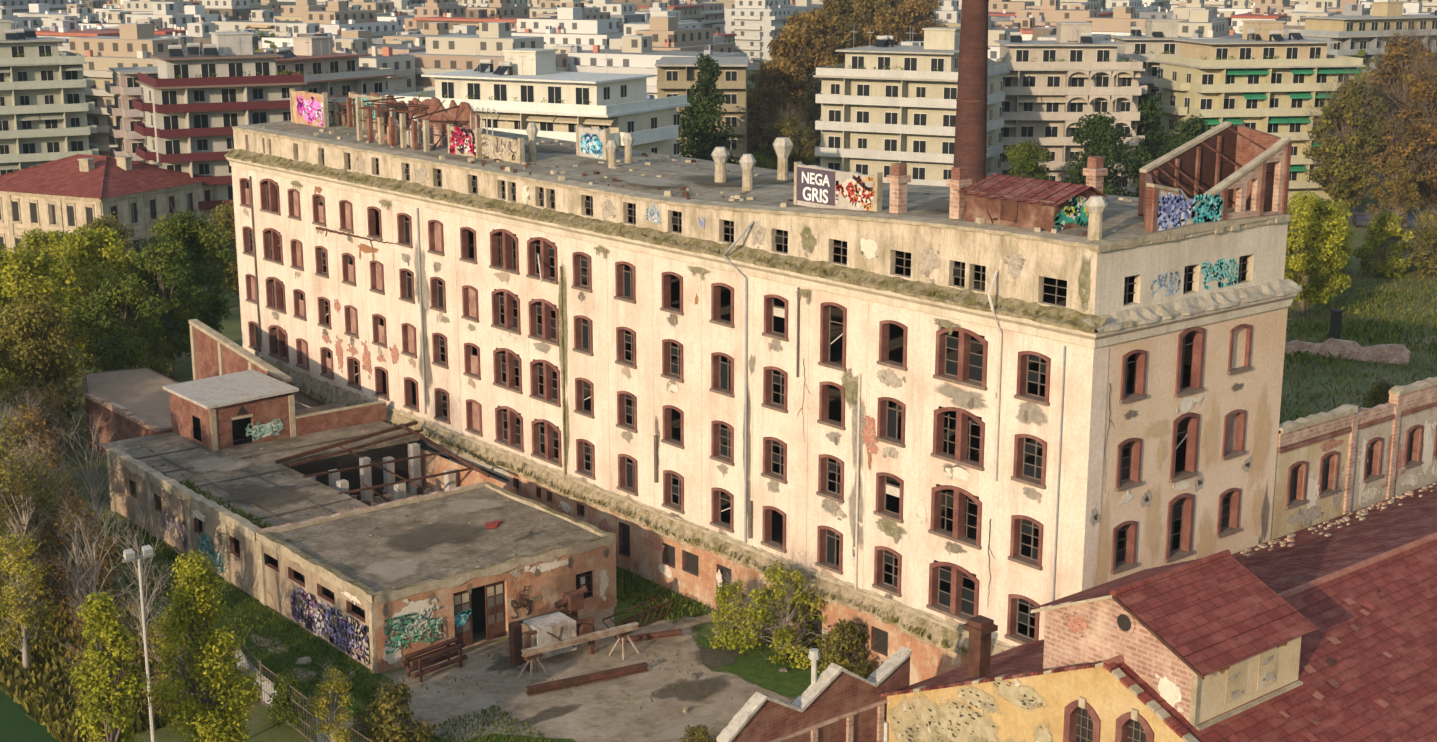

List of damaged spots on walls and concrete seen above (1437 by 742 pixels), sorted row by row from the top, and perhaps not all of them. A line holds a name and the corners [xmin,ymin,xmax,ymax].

water stain [912,199,950,211]
water stain [743,339,782,514]
water stain [823,385,865,564]
flaking render [860,414,898,470]
flaking render [1288,419,1437,528]
water stain [368,500,502,581]
water stain [946,542,966,555]
flaking render [888,678,1052,742]